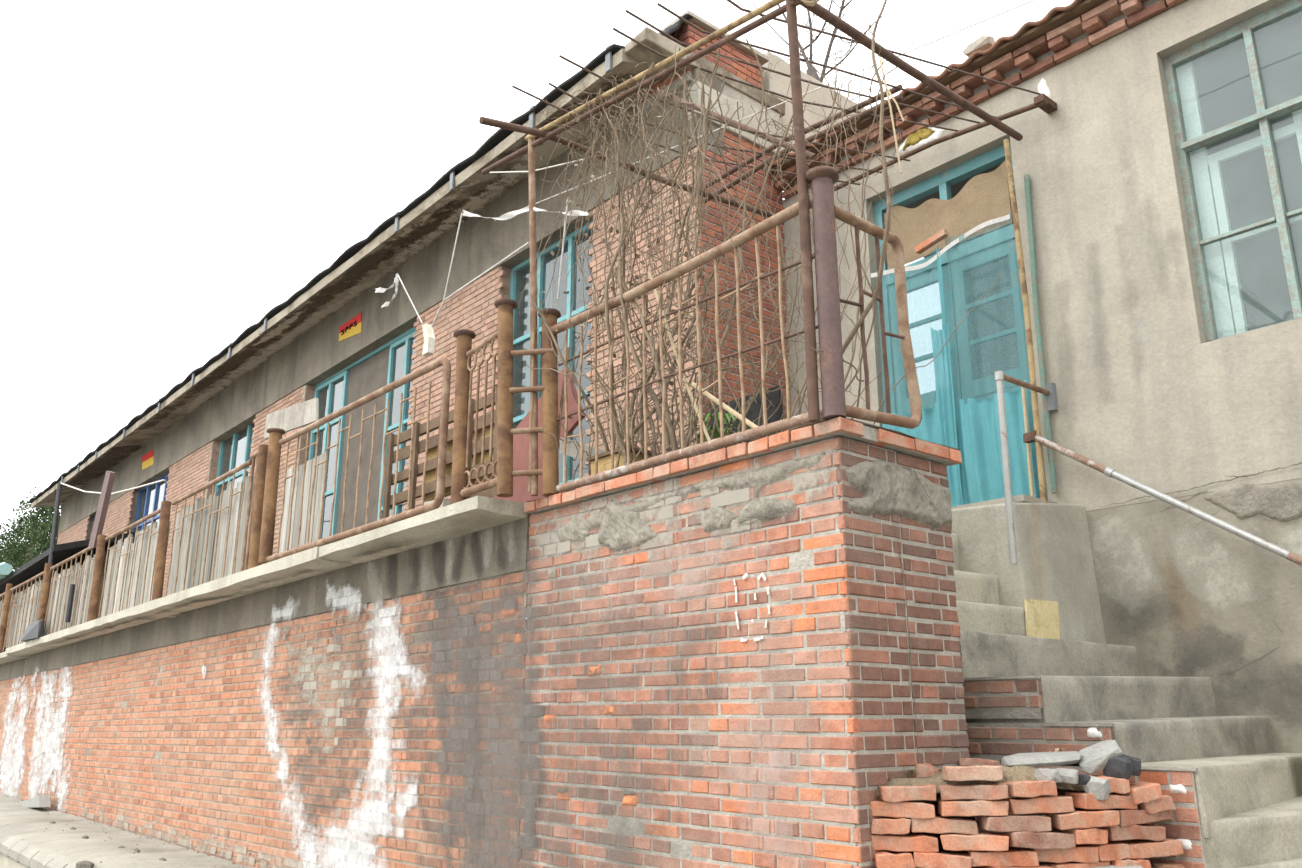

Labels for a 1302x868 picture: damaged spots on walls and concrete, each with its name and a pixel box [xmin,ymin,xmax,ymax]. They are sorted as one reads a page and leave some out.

spalling [718,458,752,476]
peeling [1089,515,1158,605]
peeling [1174,526,1251,610]
peeling [1204,481,1302,557]
water stain [82,452,952,868]
water stain [0,667,72,811]